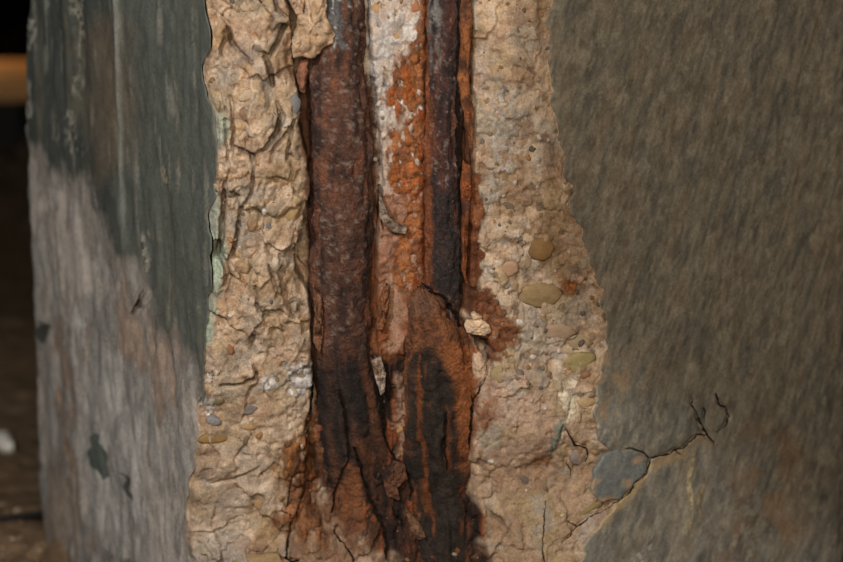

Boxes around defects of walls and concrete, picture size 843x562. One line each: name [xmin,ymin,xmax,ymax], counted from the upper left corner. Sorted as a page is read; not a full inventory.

rust [380,0,427,293]
spalling [28,0,647,562]
rust [463,174,519,365]
peeling [0,430,13,452]
crack [282,384,314,562]
crack [331,383,413,562]
crack [542,394,730,562]